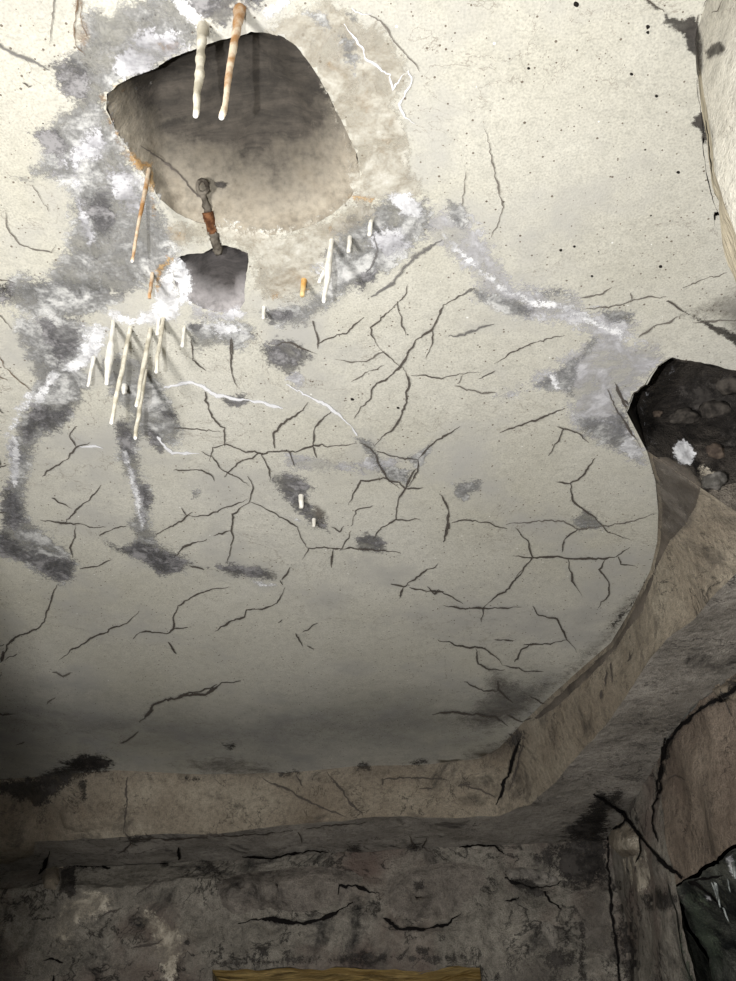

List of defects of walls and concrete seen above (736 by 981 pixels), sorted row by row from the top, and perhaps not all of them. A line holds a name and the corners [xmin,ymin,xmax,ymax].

crack [0,0,55,88]
spalling [106,32,360,235]
crack [5,212,56,253]
spalling [175,245,249,313]
leakage [0,0,713,587]
spalling [625,357,736,448]
crack [41,236,652,727]
crack [0,585,57,676]
crack [121,681,239,743]
crack [238,884,379,925]
crack [384,914,461,931]